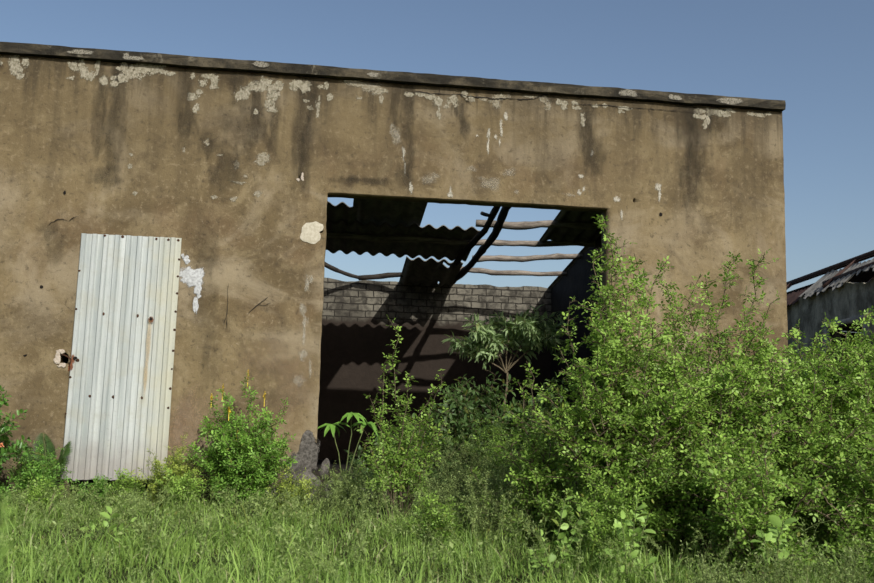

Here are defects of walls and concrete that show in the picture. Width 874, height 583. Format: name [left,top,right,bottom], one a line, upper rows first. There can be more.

peeling [0,55,30,80]
peeling [66,59,176,88]
peeling [187,73,220,113]
peeling [233,75,333,118]
peeling [404,91,509,120]
peeling [525,96,586,126]
peeling [693,107,736,129]
leakage [476,112,508,154]
peeling [254,152,269,166]
spalling [53,349,66,368]